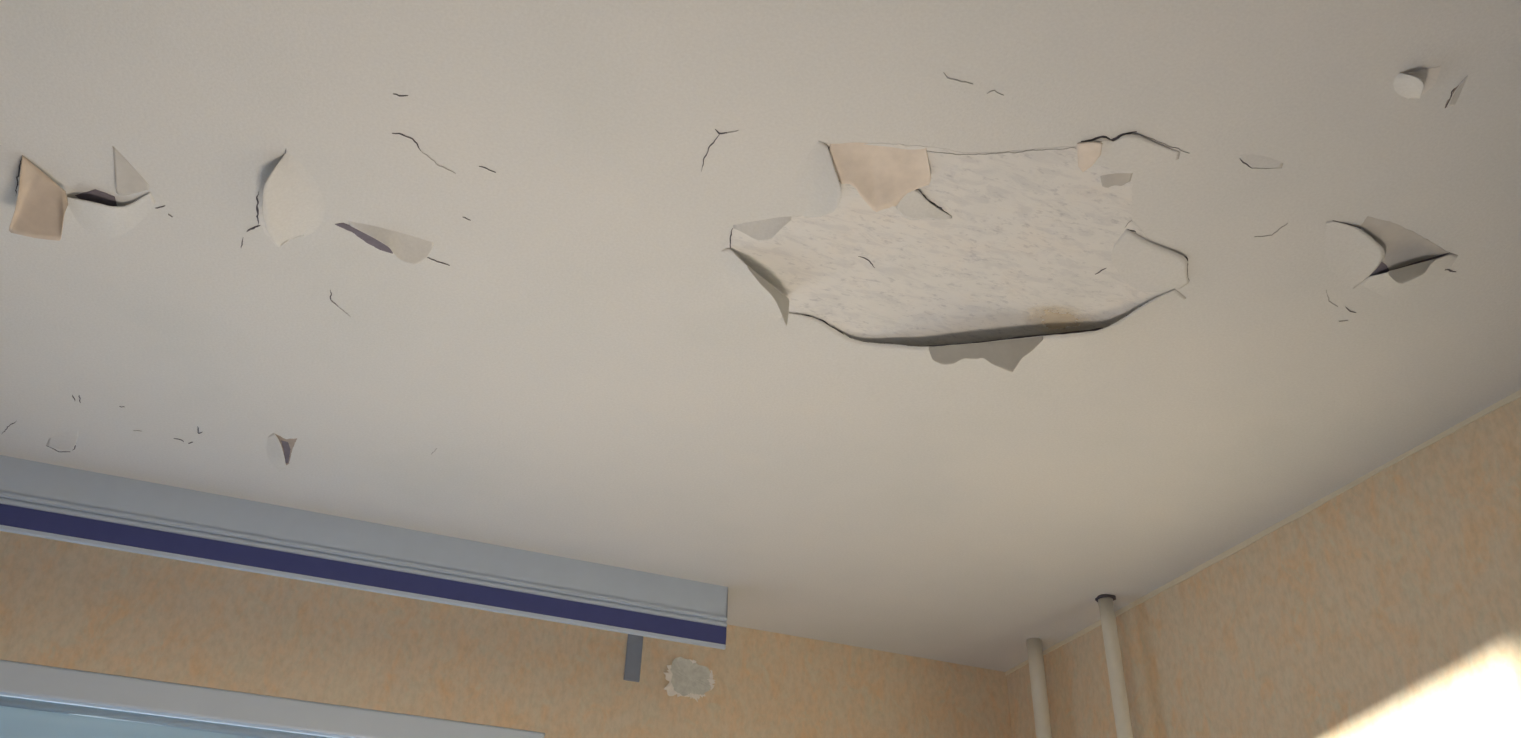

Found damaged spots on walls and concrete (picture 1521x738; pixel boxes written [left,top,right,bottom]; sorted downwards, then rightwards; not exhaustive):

peeling [9,146,156,241]
peeling [241,150,450,266]
crack [392,133,496,174]
crack [701,129,738,171]
peeling [721,131,1189,423]
peeling [1325,216,1458,299]
peeling [266,433,297,471]